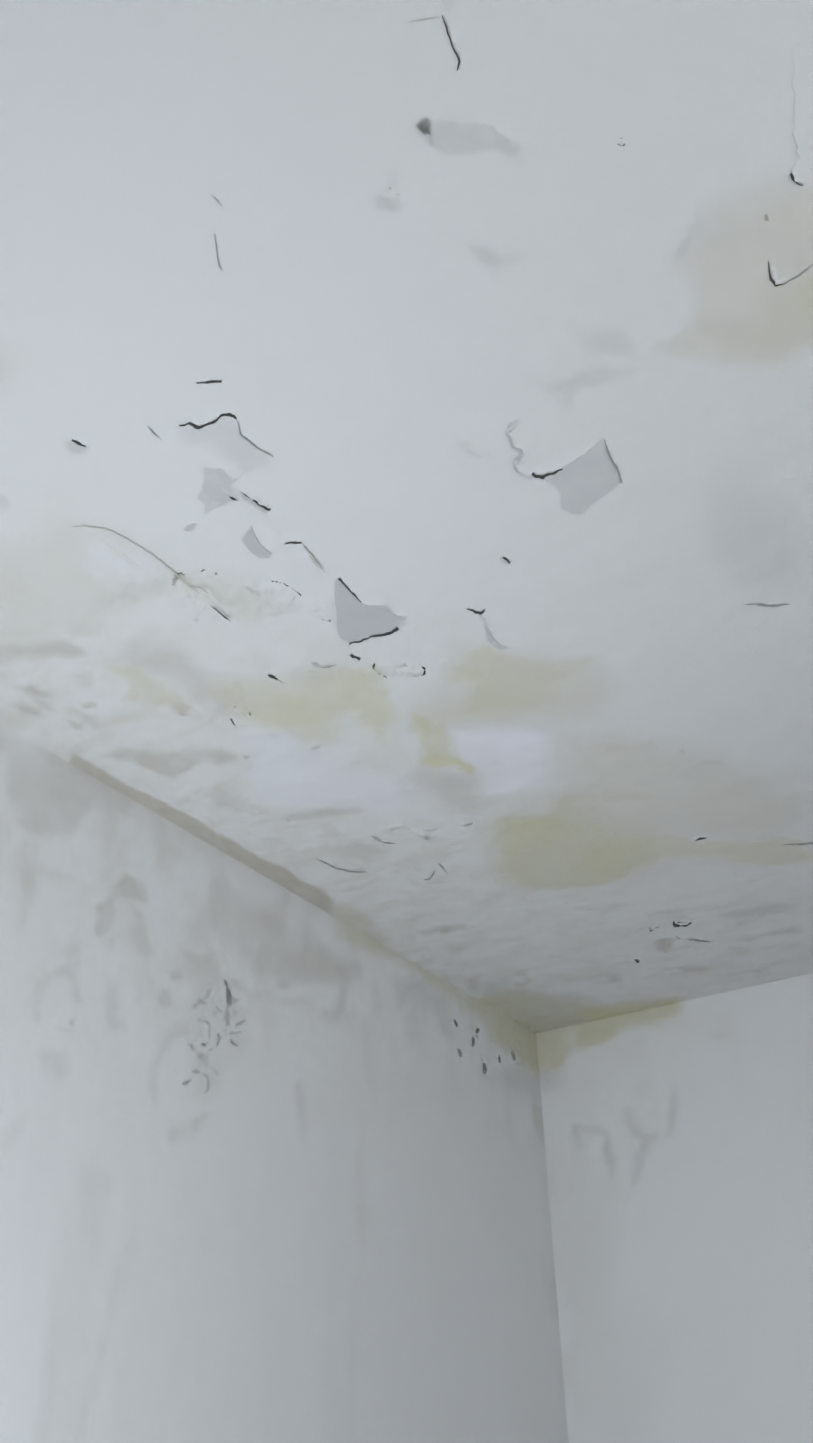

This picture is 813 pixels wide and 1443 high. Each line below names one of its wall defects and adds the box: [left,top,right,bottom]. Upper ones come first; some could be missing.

spalling [404,98,523,147]
crack [146,371,276,457]
peeling [505,421,631,515]
spalling [169,464,428,683]
water stain [416,719,550,795]
water stain [496,799,655,887]
water stain [189,980,242,1049]
water stain [481,974,675,1034]